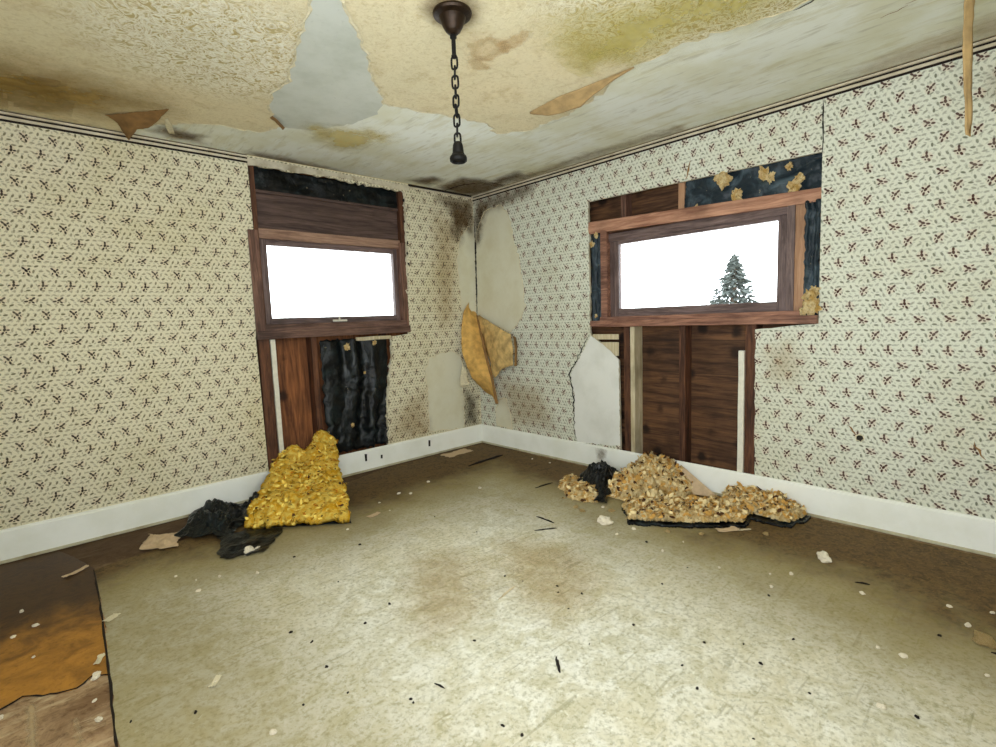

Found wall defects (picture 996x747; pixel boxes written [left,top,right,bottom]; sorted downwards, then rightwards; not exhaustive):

leakage [0,66,132,111]
peeling [530,67,634,116]
peeling [962,0,975,137]
peeling [105,109,174,140]
flaking render [247,157,410,293]
leakage [414,174,526,238]